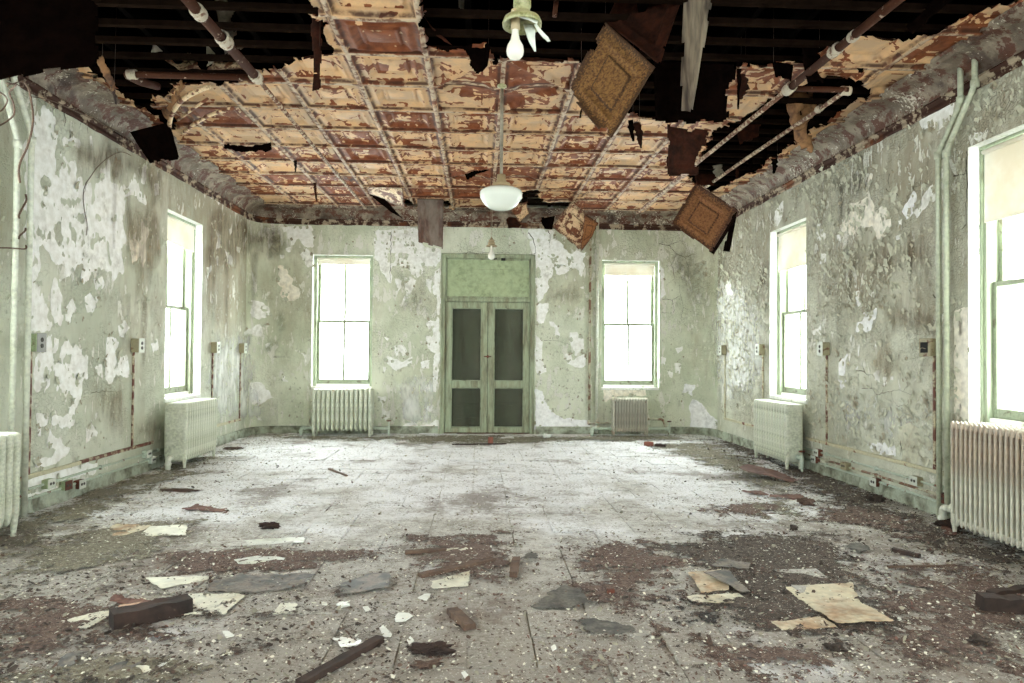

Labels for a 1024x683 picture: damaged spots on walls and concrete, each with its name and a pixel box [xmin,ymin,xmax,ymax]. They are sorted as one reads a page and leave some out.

peeling [919,98,955,136]
peeling [775,201,784,226]
peeling [812,173,935,264]
peeling [22,105,159,497]
peeling [276,224,317,302]
peeling [374,227,441,429]
peeling [528,229,588,376]
peeling [717,280,745,327]
peeling [534,389,590,430]